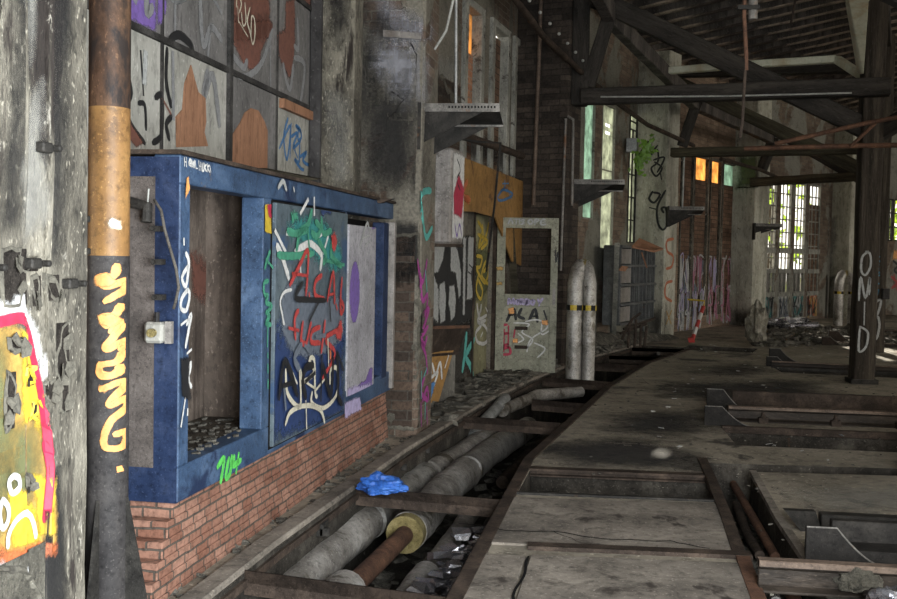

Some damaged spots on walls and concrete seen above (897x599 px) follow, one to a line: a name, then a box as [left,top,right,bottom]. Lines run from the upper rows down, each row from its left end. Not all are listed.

water stain [26,105,41,226]
crack [459,523,706,548]
crack [512,556,529,599]